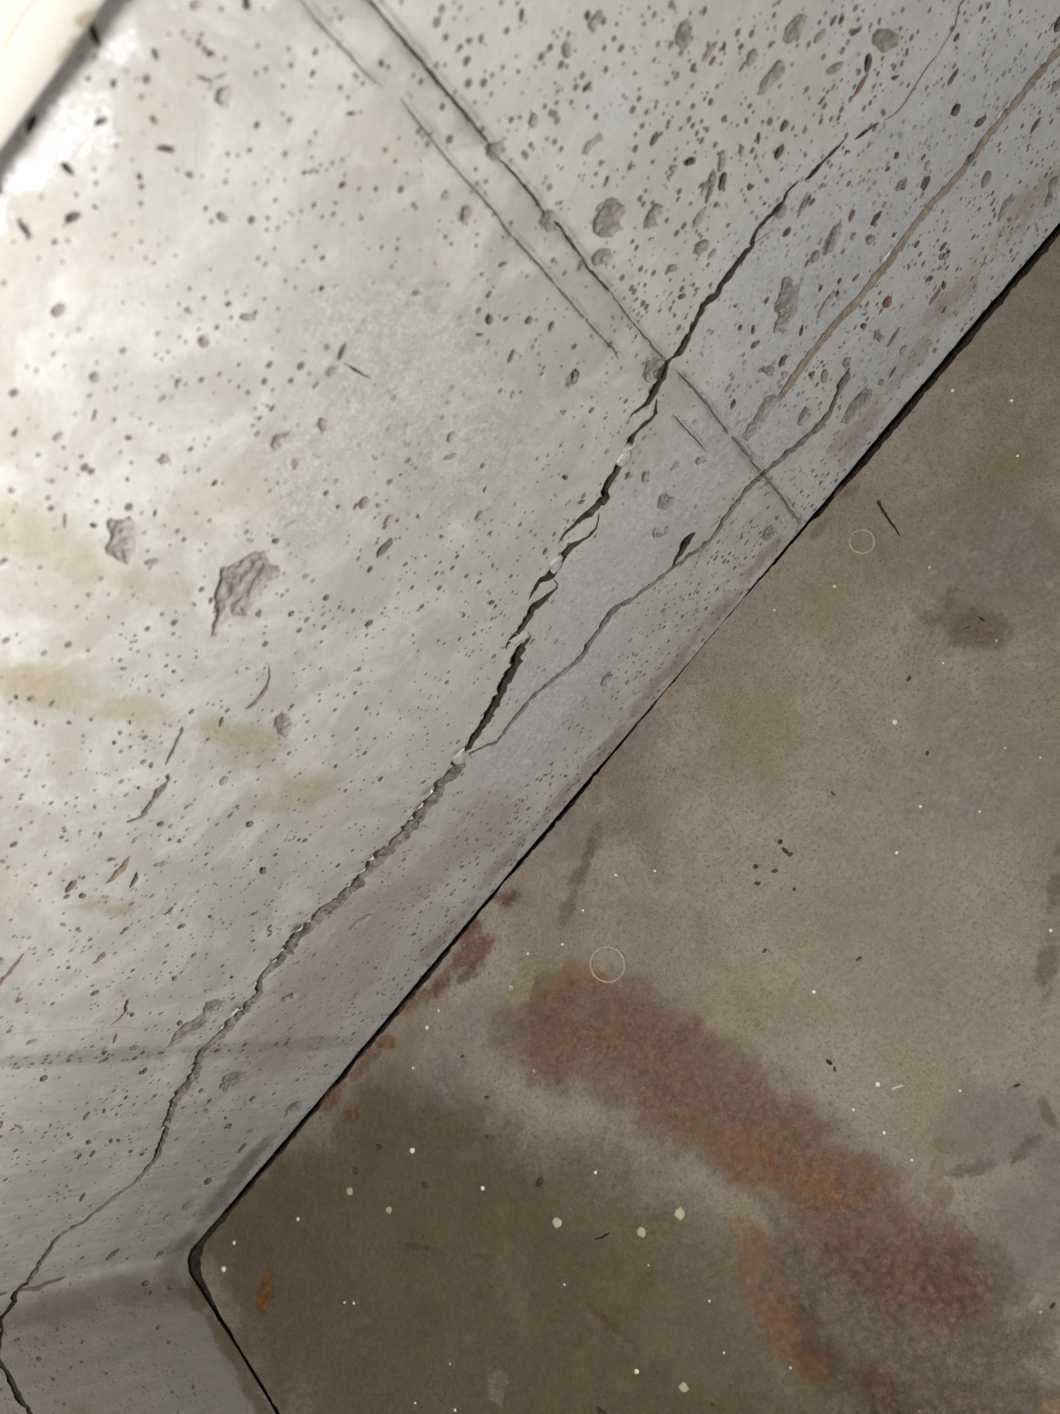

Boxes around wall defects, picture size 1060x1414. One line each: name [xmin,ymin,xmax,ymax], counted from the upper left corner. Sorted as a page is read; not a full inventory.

crack [854,0,965,140]
spalling [210,550,281,638]
crack [0,138,850,1349]
crack [0,1359,33,1414]